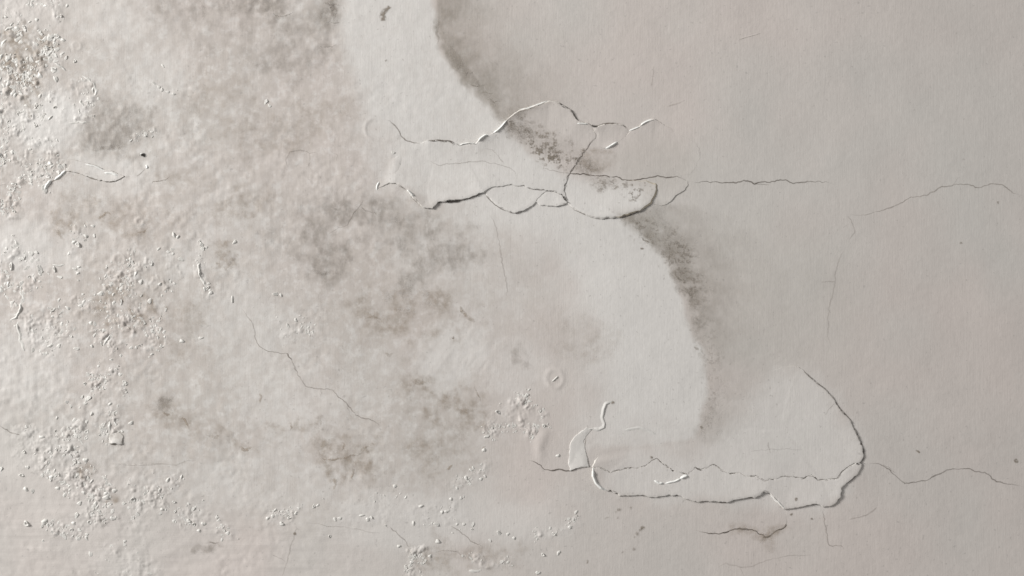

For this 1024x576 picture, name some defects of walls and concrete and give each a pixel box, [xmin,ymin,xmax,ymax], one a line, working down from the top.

peeling [376,100,700,219]
peeling [537,366,864,509]
crack [708,525,787,538]